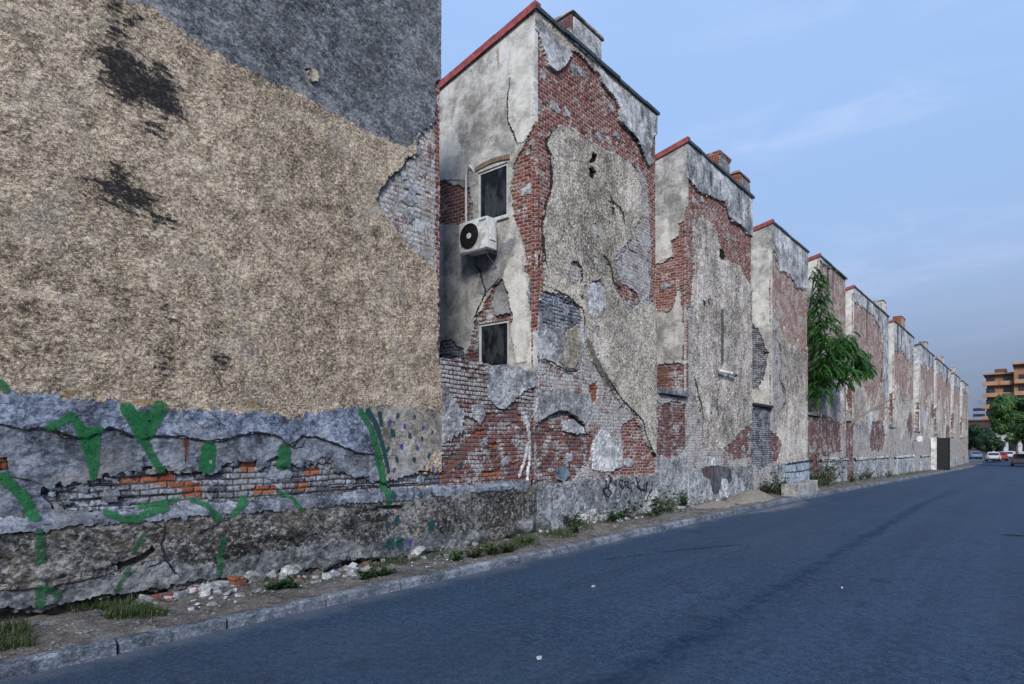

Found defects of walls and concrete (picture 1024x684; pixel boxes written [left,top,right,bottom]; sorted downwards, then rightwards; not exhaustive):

water stain [75,0,195,142]
crack [506,81,518,145]
water stain [82,154,186,237]
spalling [376,15,968,494]
crack [14,477,177,504]
crack [3,424,393,466]
spalling [40,402,593,512]
crack [319,481,426,489]
crack [604,374,656,457]
crack [4,576,106,591]
crack [148,523,180,576]
crack [305,557,384,571]